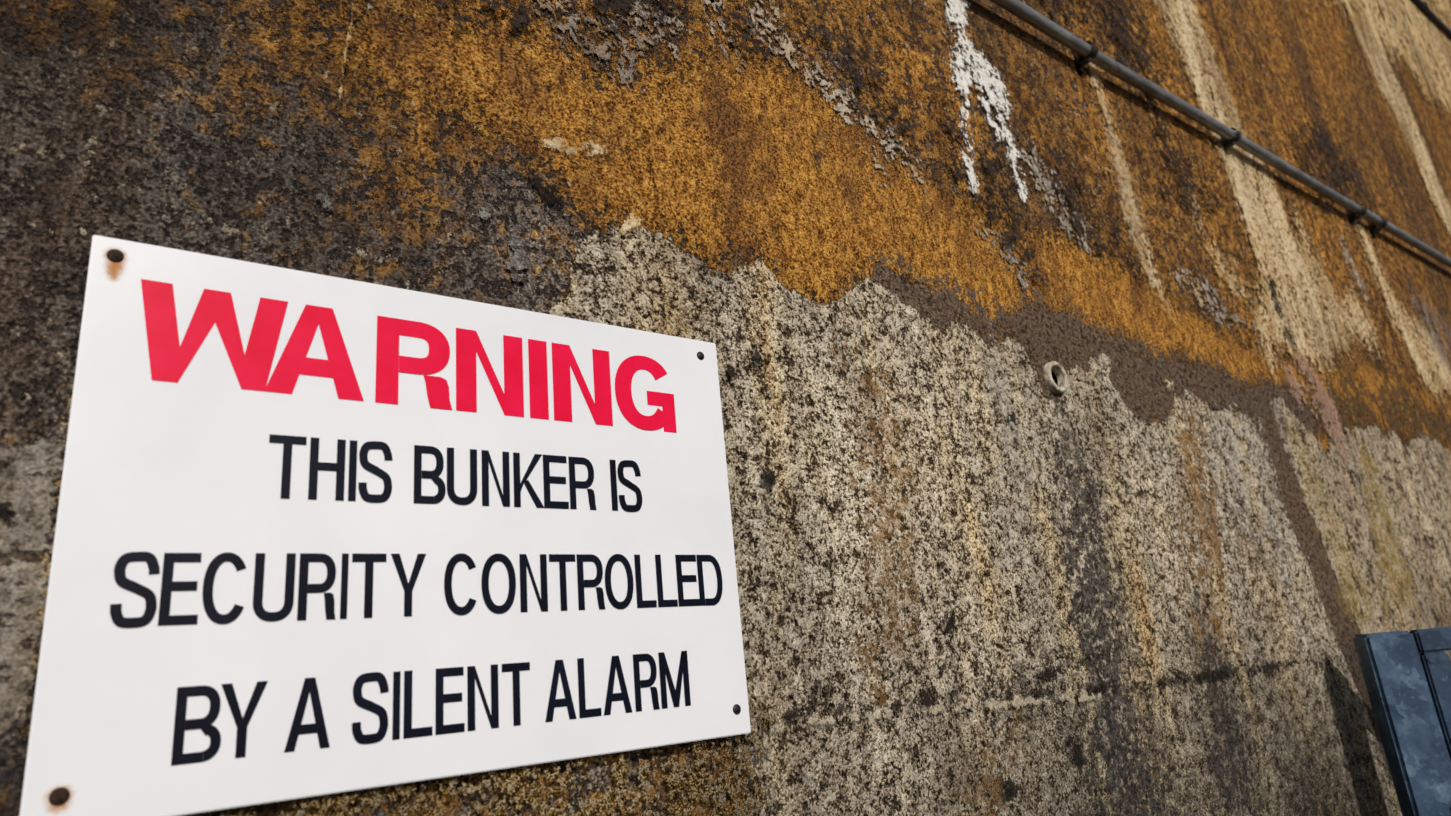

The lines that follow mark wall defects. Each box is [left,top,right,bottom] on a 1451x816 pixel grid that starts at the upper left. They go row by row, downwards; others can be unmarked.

water stain [437,0,567,44]
water stain [721,0,776,62]
water stain [793,7,919,156]
rust [106,254,125,279]
water stain [837,0,1451,816]
water stain [0,719,29,788]